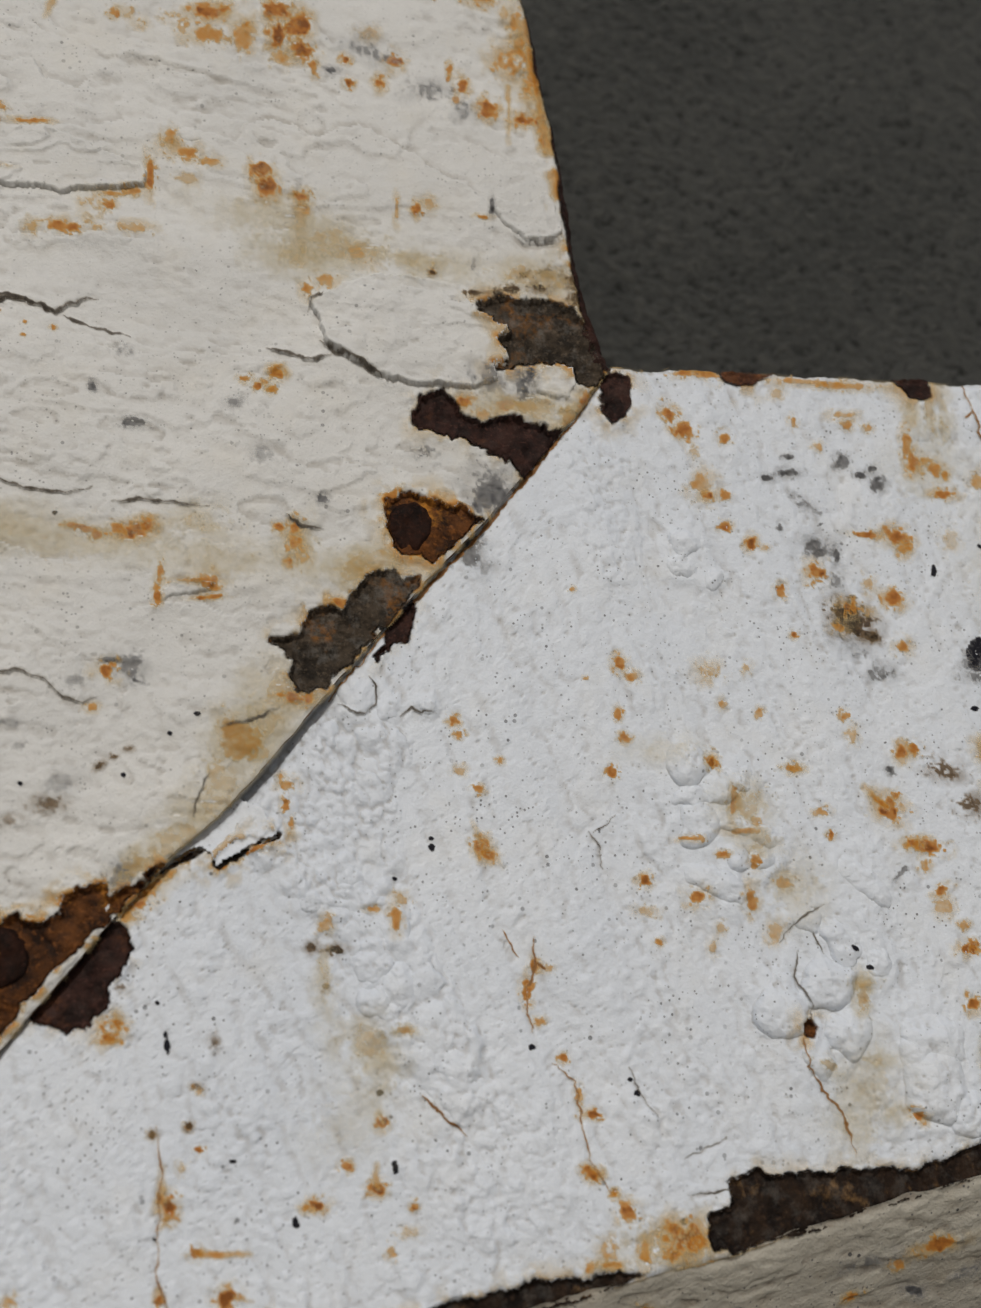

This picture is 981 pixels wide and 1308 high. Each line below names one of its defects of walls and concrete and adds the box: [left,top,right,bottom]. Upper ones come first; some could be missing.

corrosion [172,0,319,78]
peeling [308,0,632,479]
crack [0,291,123,335]
crack [268,340,382,377]
crack [413,385,600,603]
peeling [268,491,491,696]
corrosion [822,579,909,652]
peeling [0,799,282,1042]
crack [781,907,856,1150]
corrosion [579,1164,642,1223]
corrosion [637,1214,715,1270]
peeling [707,1143,981,1256]